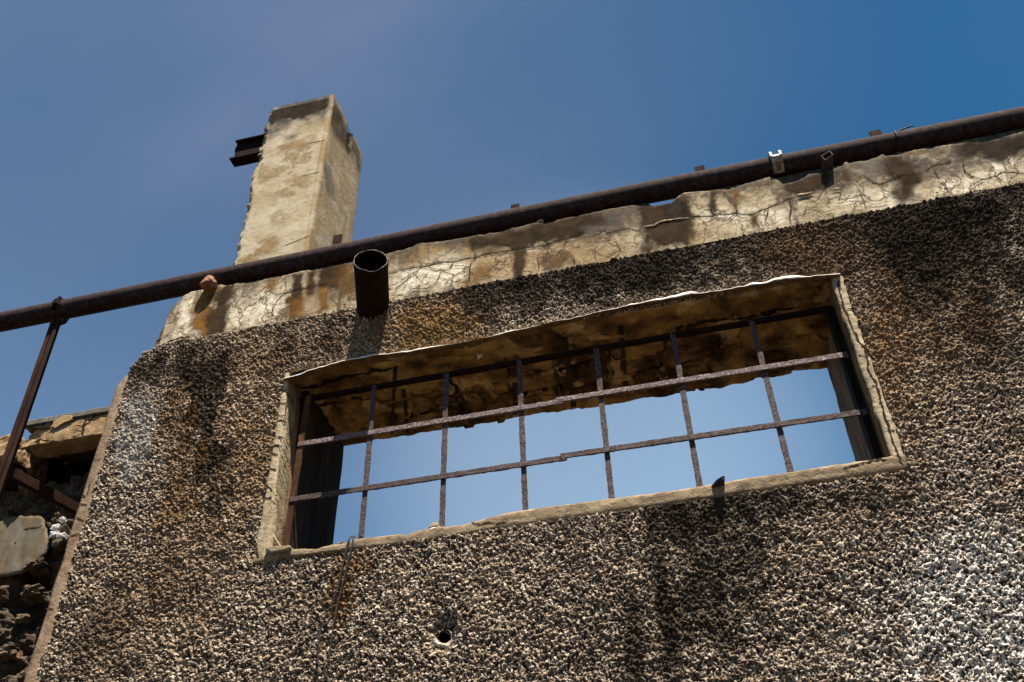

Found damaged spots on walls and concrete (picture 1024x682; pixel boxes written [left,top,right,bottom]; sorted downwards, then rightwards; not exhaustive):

water stain [469,213,603,294]
water stain [639,198,694,256]
crack [393,153,1022,292]
water stain [858,155,1017,299]
crack [167,305,199,342]
corrosion [190,287,219,335]
crack [259,282,317,321]
corrosion [286,264,345,319]
peeling [28,415,73,430]
water stain [183,352,227,484]
peeling [49,517,70,552]